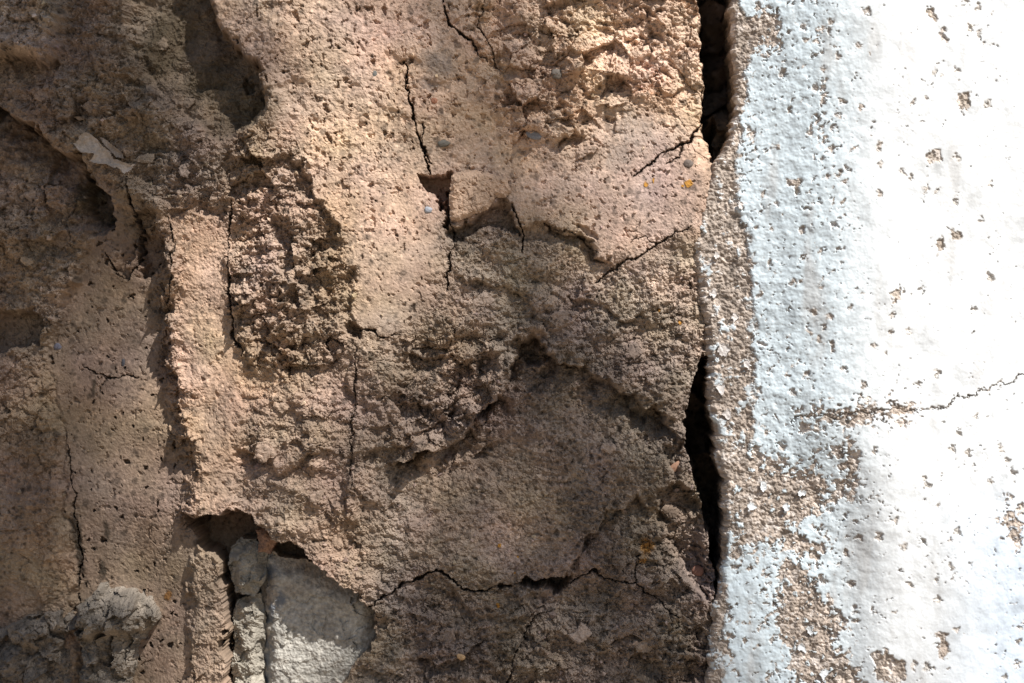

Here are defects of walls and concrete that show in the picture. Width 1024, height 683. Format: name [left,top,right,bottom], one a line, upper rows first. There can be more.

peeling [961,0,999,47]
crack [403,62,432,176]
crack [634,124,702,176]
peeling [896,61,1001,122]
crack [445,223,456,292]
crack [549,223,691,283]
spalling [235,0,972,683]
crack [791,374,1023,424]
peeling [899,421,1024,604]
crack [368,568,523,608]
crack [566,554,680,619]
peeling [987,603,1024,680]